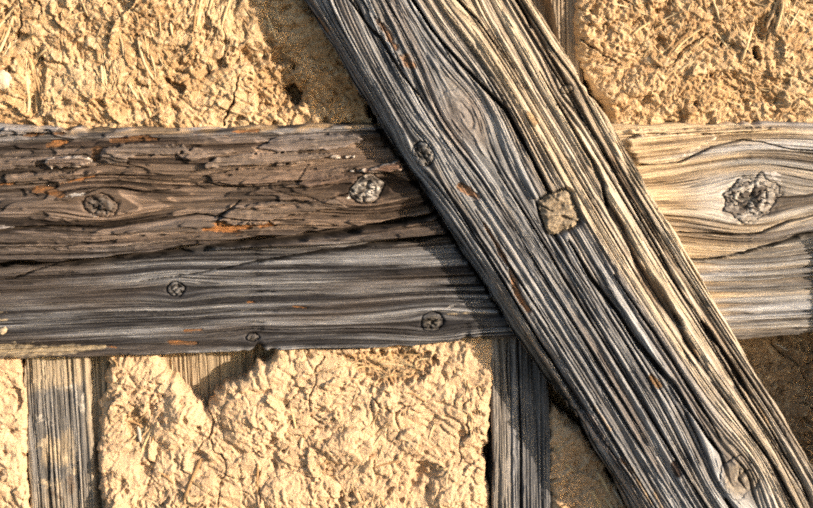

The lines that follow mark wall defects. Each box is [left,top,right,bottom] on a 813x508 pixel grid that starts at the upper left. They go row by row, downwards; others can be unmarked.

crack [0,181,452,281]